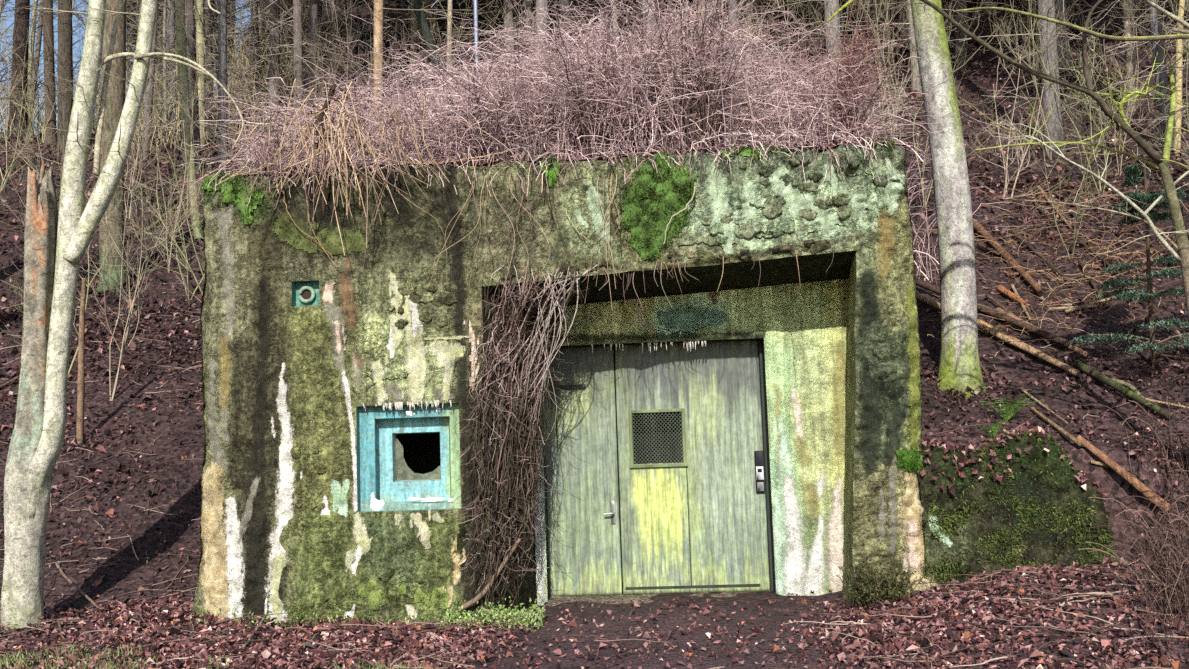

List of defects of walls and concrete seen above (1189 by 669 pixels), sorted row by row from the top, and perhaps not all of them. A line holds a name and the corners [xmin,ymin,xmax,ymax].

spalling [395,282,458,330]
damp [859,271,953,591]